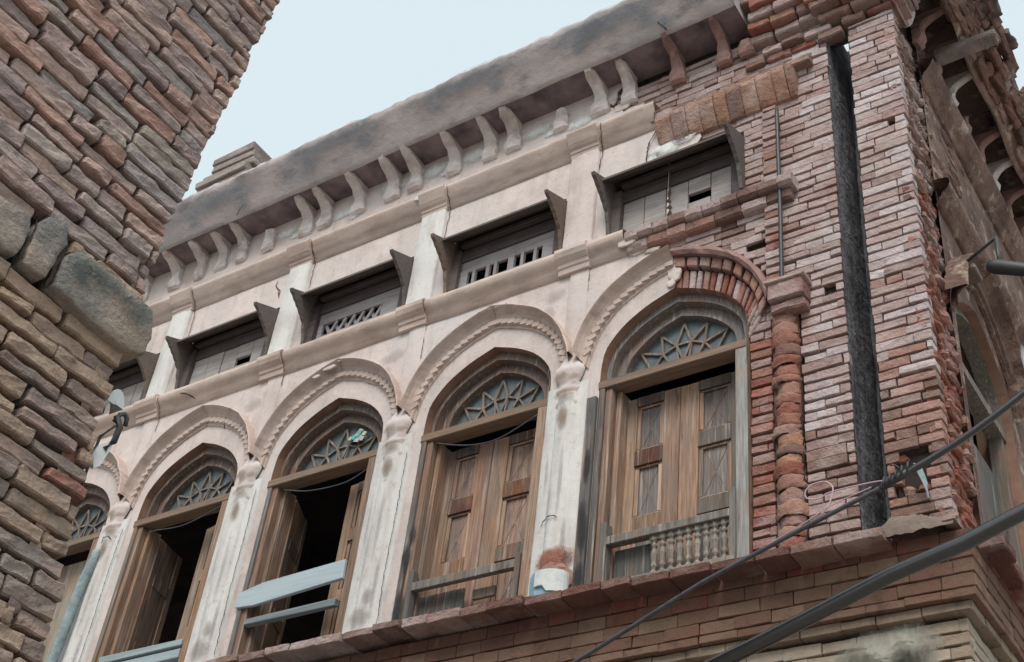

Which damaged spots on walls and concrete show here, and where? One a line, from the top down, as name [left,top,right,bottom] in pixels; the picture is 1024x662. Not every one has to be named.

flaking render [608,24,862,551]
spalling [896,446,931,473]
spalling [898,473,933,498]
spalling [540,562,574,588]